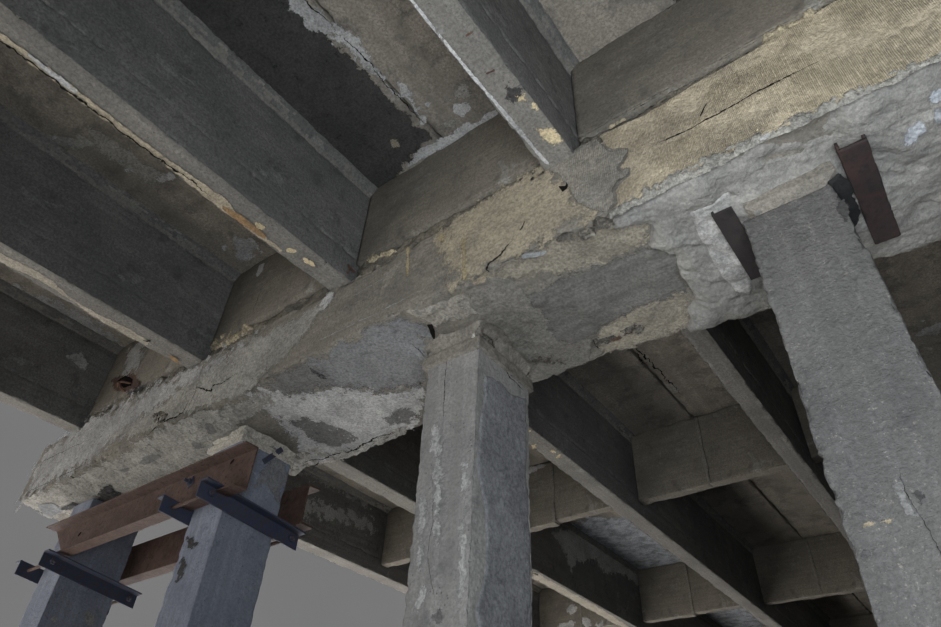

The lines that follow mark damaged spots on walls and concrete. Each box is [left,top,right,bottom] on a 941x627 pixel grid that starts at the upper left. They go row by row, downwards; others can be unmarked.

peeling [0,33,235,218]
peeling [410,0,941,242]
peeling [243,225,282,252]
crack [485,221,525,272]
peeling [0,253,150,345]
spalling [415,324,435,339]
corrosion [111,342,147,395]
crack [636,346,678,391]
peeling [23,292,334,519]
spalling [289,426,407,476]